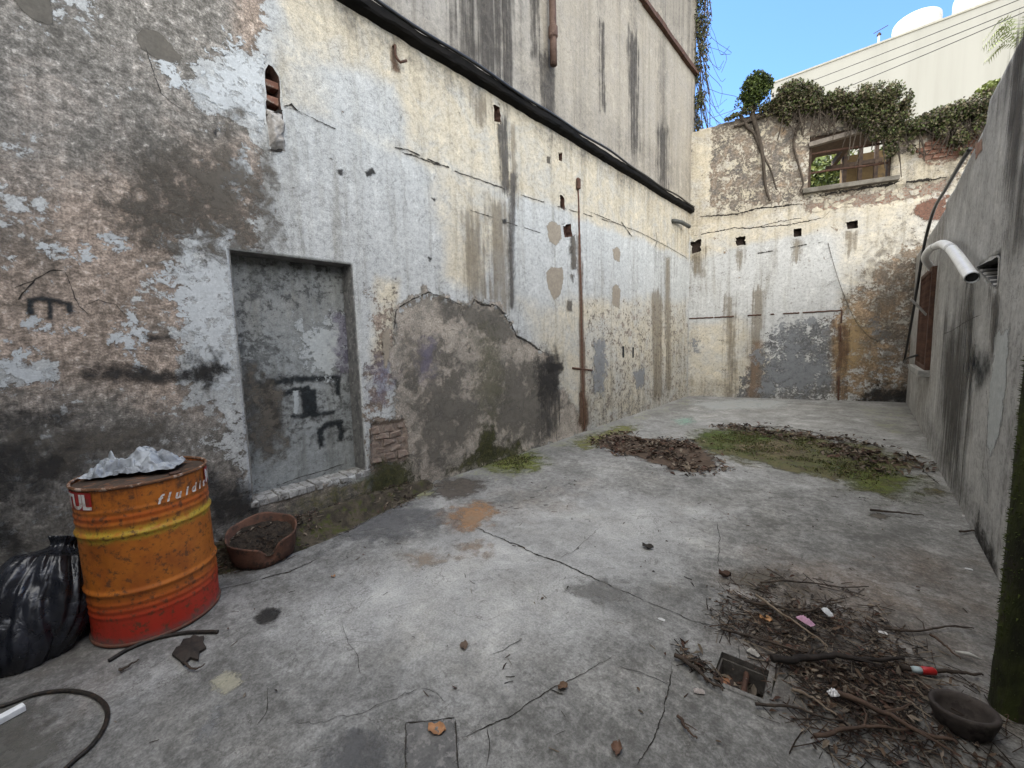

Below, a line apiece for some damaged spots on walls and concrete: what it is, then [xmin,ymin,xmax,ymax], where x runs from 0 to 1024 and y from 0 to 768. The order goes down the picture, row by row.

peeling [149,25,286,205]
crack [395,147,502,188]
damp [449,0,513,86]
damp [466,118,517,312]
damp [627,29,641,156]
crack [525,196,829,259]
spalling [802,124,985,253]
peeling [146,210,248,412]
spalling [369,285,582,483]
corrosion [567,235,589,432]
corrosion [437,501,499,557]
crack [465,655,672,765]